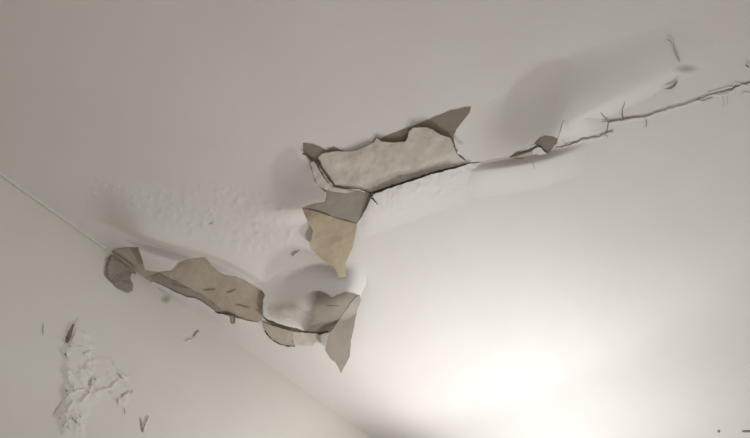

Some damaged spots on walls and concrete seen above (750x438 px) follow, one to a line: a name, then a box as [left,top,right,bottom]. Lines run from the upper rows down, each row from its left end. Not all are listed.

peeling [302,107,483,278]
crack [468,82,750,198]
peeling [105,247,361,372]